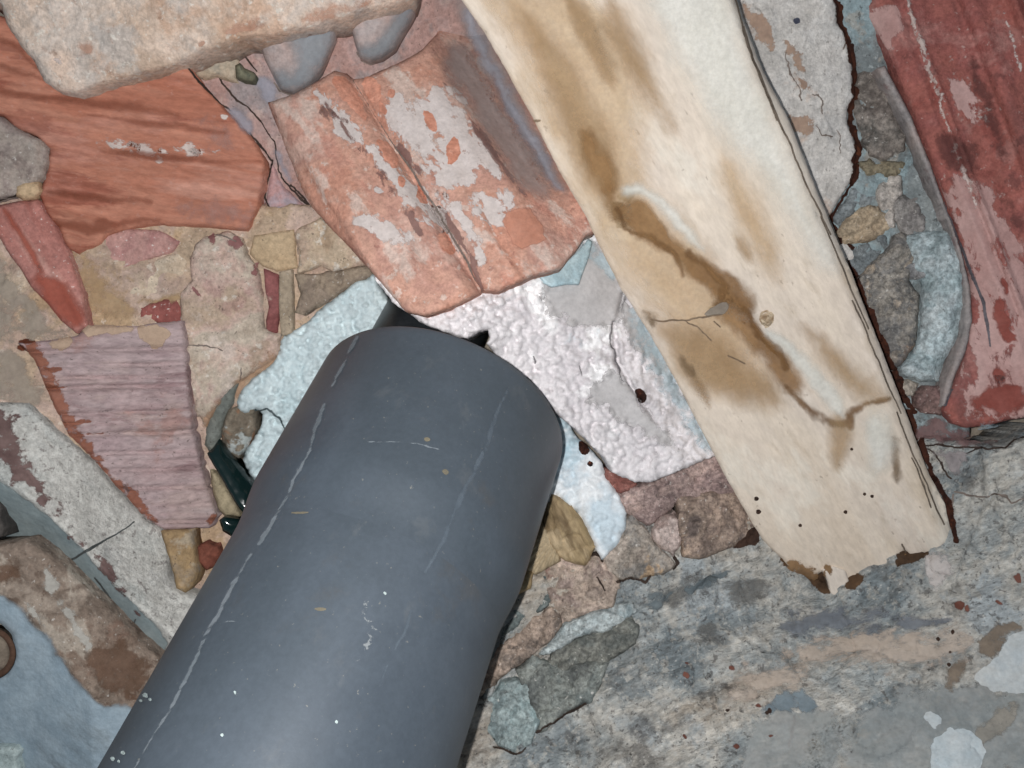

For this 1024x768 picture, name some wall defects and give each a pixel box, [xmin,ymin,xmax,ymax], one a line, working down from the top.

peeling [313,76,546,267]
peeling [540,239,592,288]
leakage [505,0,890,468]
peeling [993,278,1016,343]